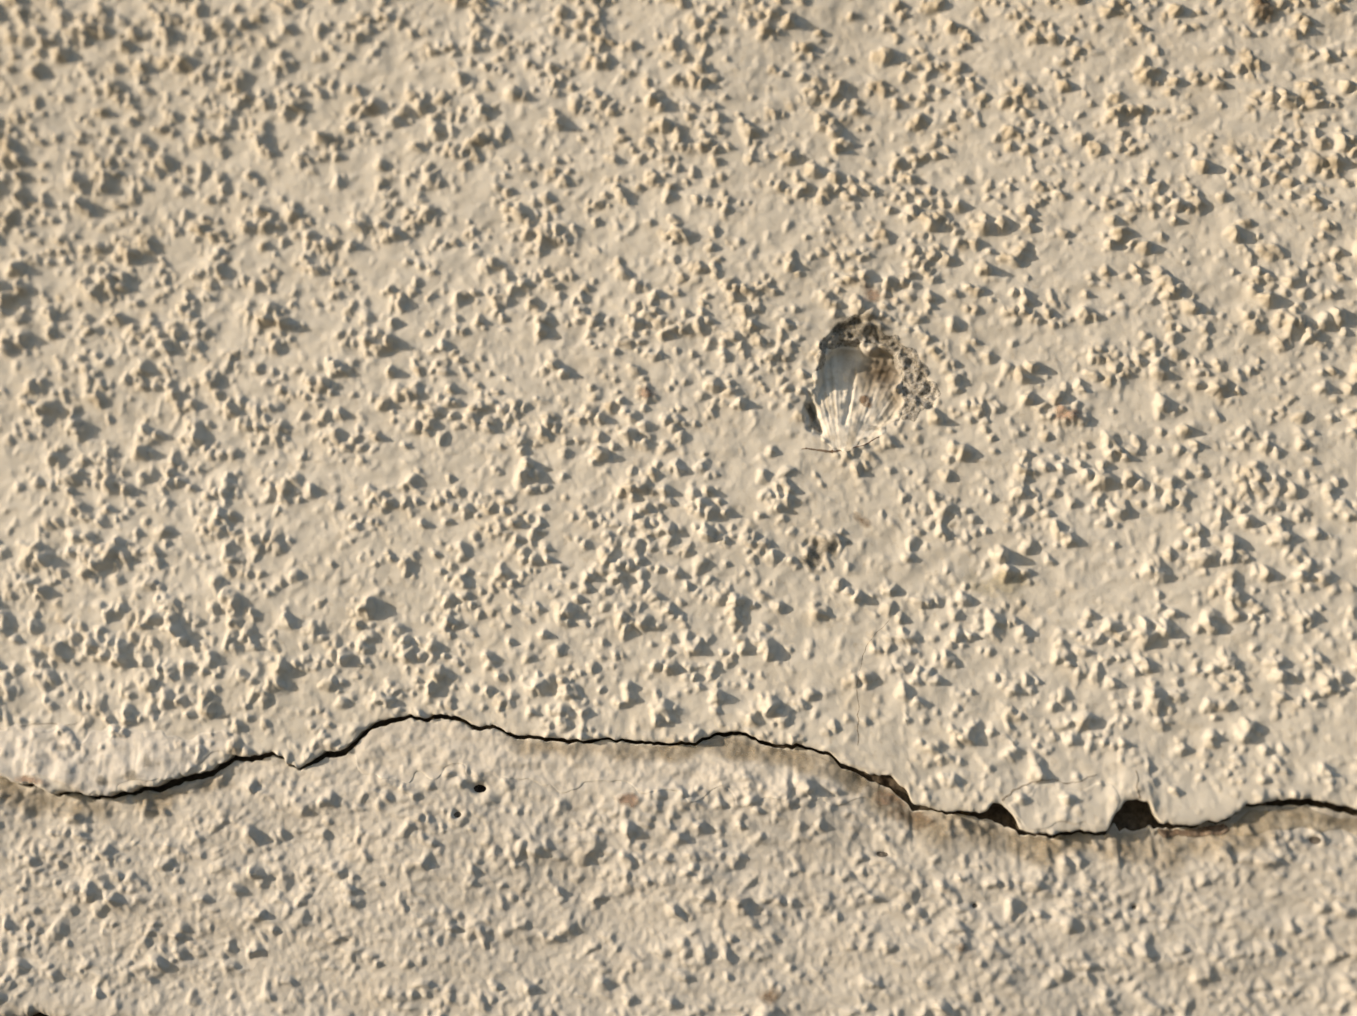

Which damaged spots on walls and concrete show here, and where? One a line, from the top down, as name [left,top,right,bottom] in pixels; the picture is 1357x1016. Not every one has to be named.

crack [24,623,1357,839]